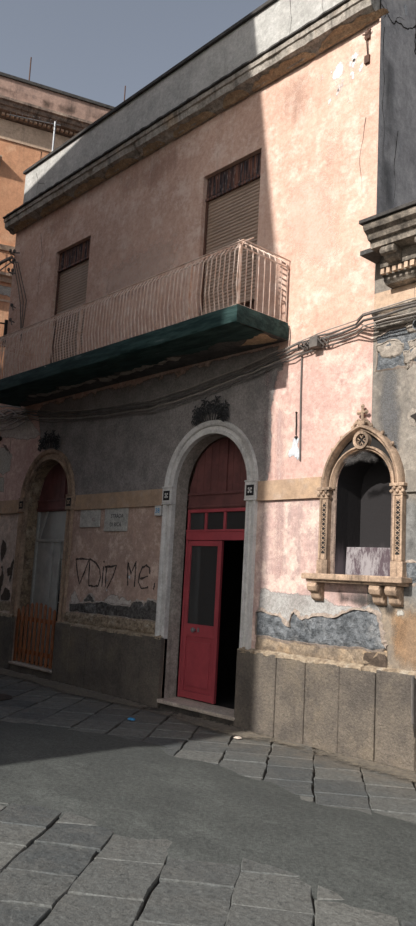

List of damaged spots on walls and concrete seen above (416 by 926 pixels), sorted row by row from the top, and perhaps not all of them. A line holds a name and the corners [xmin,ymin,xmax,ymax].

crack [359,1,416,204]
flaking render [374,322,416,372]
flaking render [69,591,157,622]
flaking render [255,588,416,668]